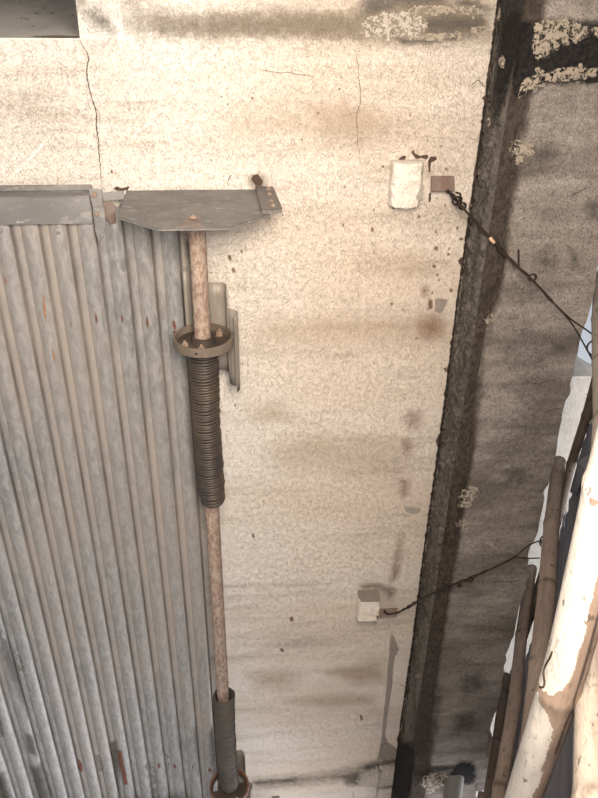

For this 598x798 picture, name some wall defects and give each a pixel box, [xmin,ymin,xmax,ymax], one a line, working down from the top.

damp [154,0,485,43]
crack [80,41,103,191]
damp [258,0,598,798]